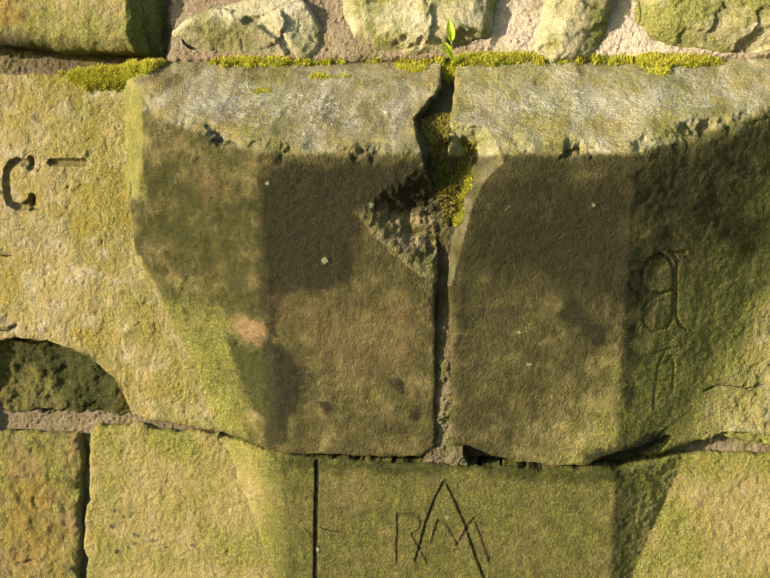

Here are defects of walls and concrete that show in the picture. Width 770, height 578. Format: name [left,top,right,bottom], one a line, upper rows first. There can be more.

crack [303,463,339,578]